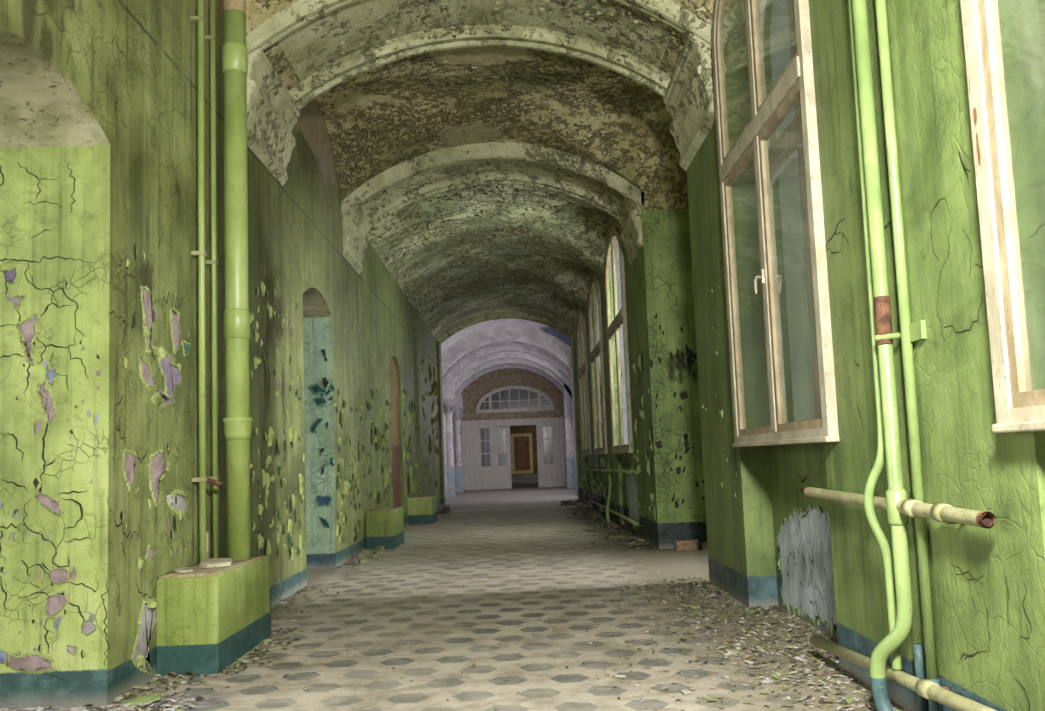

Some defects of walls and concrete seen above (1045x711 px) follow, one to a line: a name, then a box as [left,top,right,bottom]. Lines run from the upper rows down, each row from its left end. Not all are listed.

peeling [3,267,59,436]
peeling [124,285,191,407]
crack [116,381,147,463]
peeling [250,281,442,563]
peeling [580,344,694,531]
peeling [0,645,56,675]
peeling [23,566,77,630]
crack [0,415,157,667]
peeling [131,597,160,676]
peeling [122,443,189,559]
peeling [777,502,837,636]
crack [949,564,1031,660]